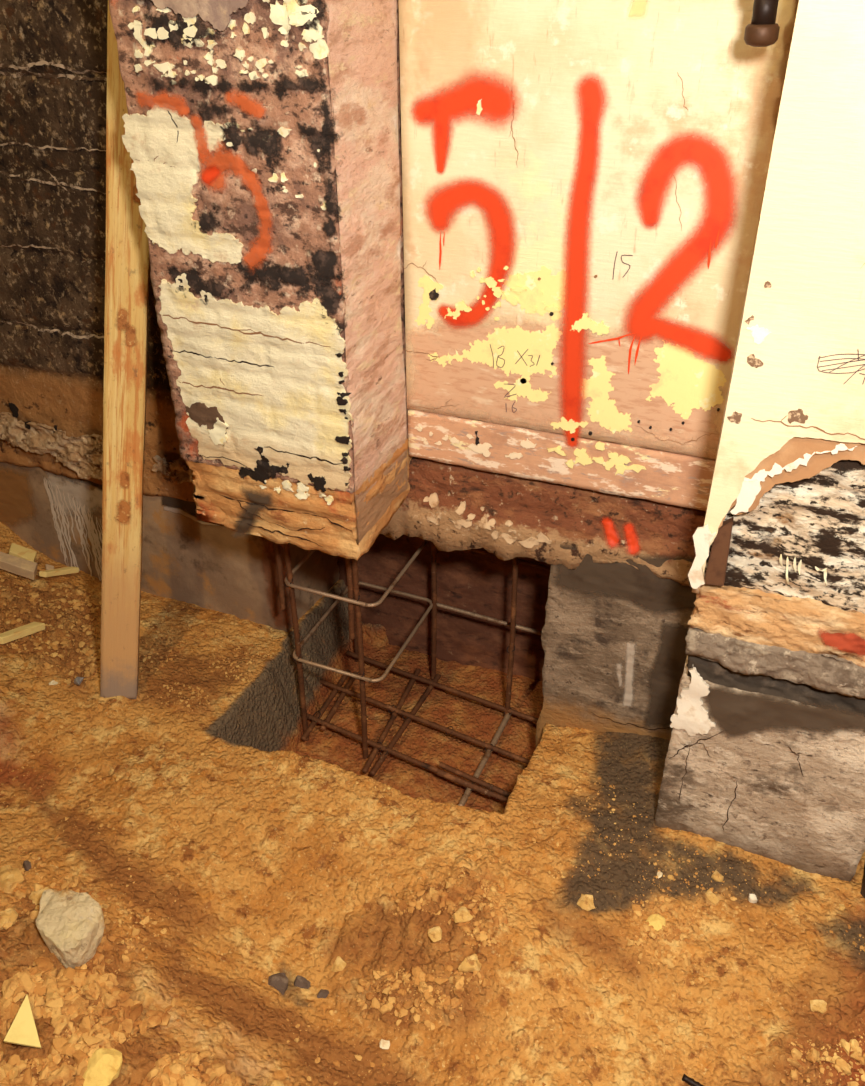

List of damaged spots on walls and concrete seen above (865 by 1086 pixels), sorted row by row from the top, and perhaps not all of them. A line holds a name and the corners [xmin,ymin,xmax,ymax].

peeling [128,0,330,86]
peeling [252,168,304,198]
peeling [158,273,354,505]
peeling [410,266,742,475]
spalling [0,402,103,480]
spalling [151,455,193,484]
water stain [42,475,103,581]
spalling [724,460,865,614]
spalling [670,667,716,736]